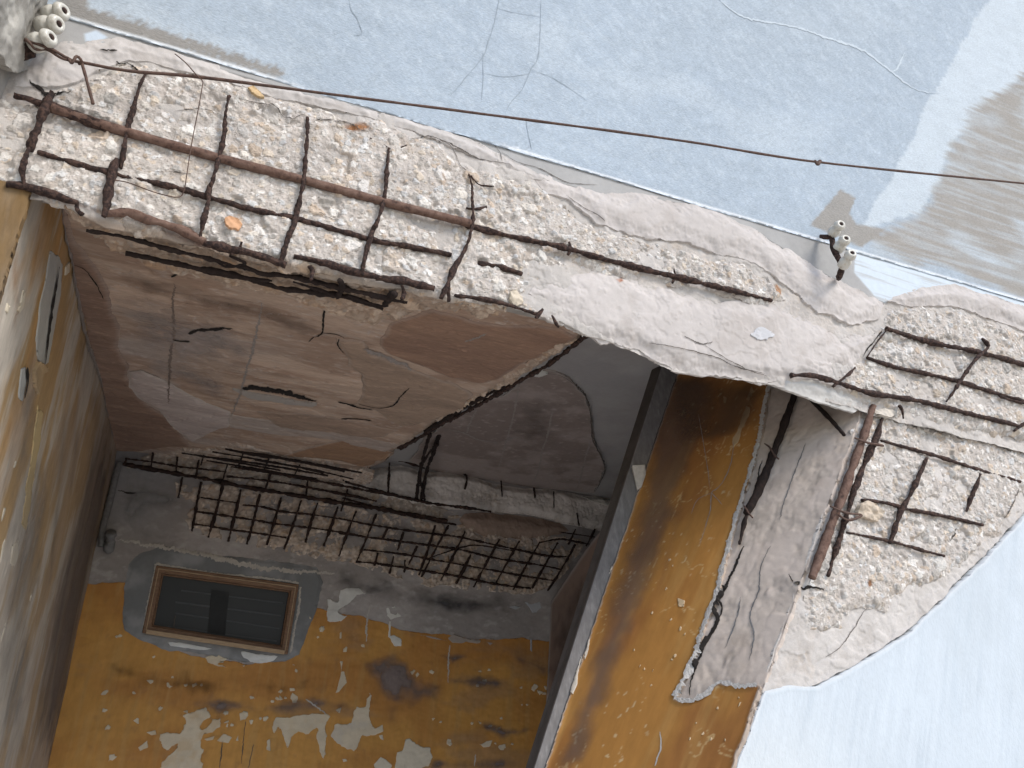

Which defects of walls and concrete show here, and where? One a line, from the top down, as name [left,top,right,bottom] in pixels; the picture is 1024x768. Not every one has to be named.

crack [720,0,939,94]
crack [411,1,605,221]
crack [174,327,232,343]
crack [242,311,412,421]
spalling [0,62,786,613]
crack [780,445,805,517]
spalling [803,306,1024,632]
peeling [241,651,277,667]
peeling [309,588,365,693]
peeling [570,638,590,694]
crack [689,546,771,695]
peeling [134,688,383,768]